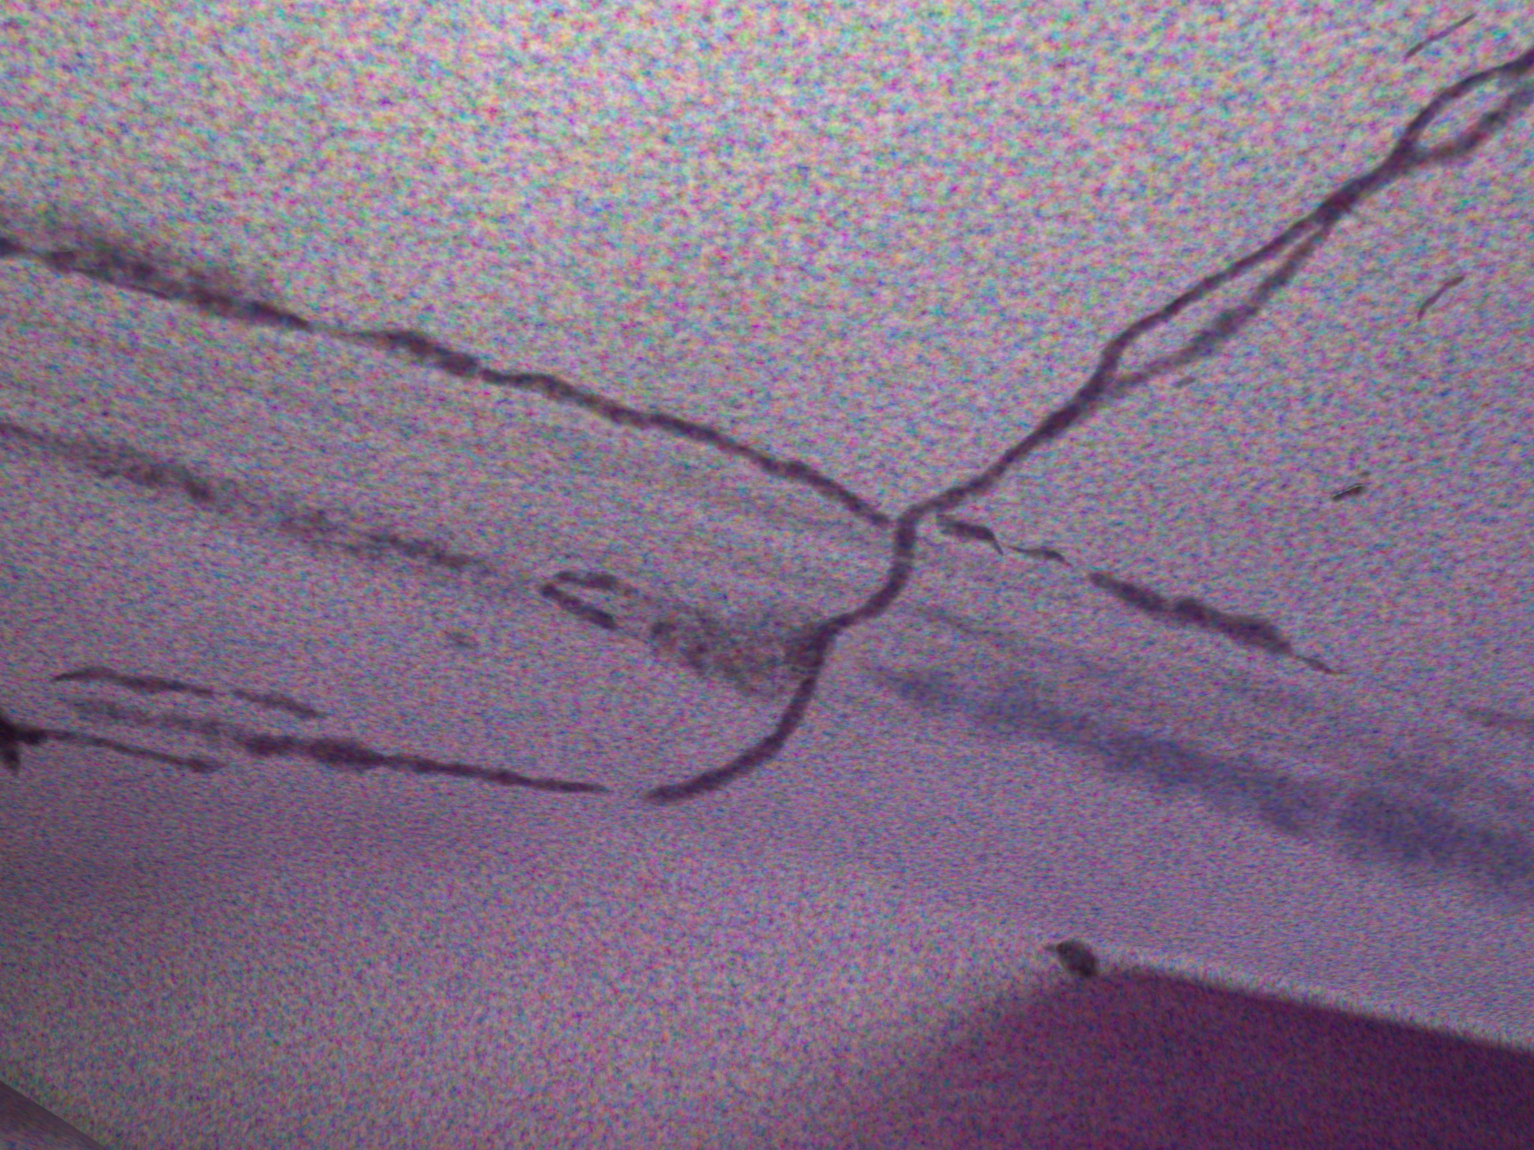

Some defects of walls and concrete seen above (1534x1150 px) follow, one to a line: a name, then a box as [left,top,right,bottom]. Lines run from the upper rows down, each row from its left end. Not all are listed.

crack [1407,16,1473,56]
crack [0,50,1534,802]